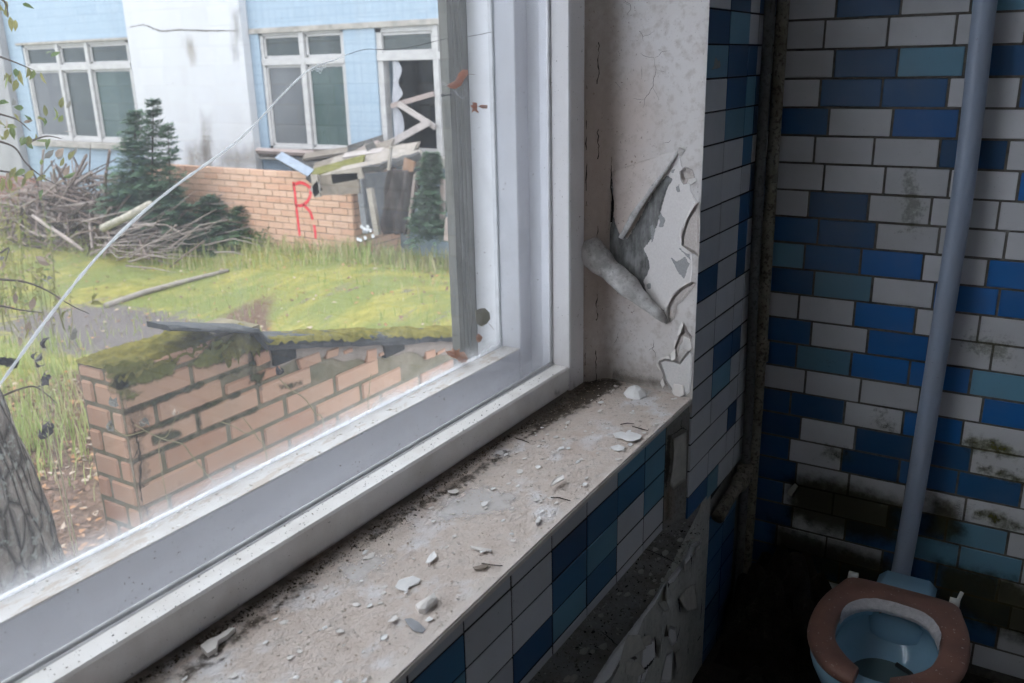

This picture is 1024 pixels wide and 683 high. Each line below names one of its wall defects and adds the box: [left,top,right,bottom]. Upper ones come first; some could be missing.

peeling [582,147,700,400]
leakage [772,476,902,582]
leakage [925,499,964,541]
peeling [593,539,702,683]